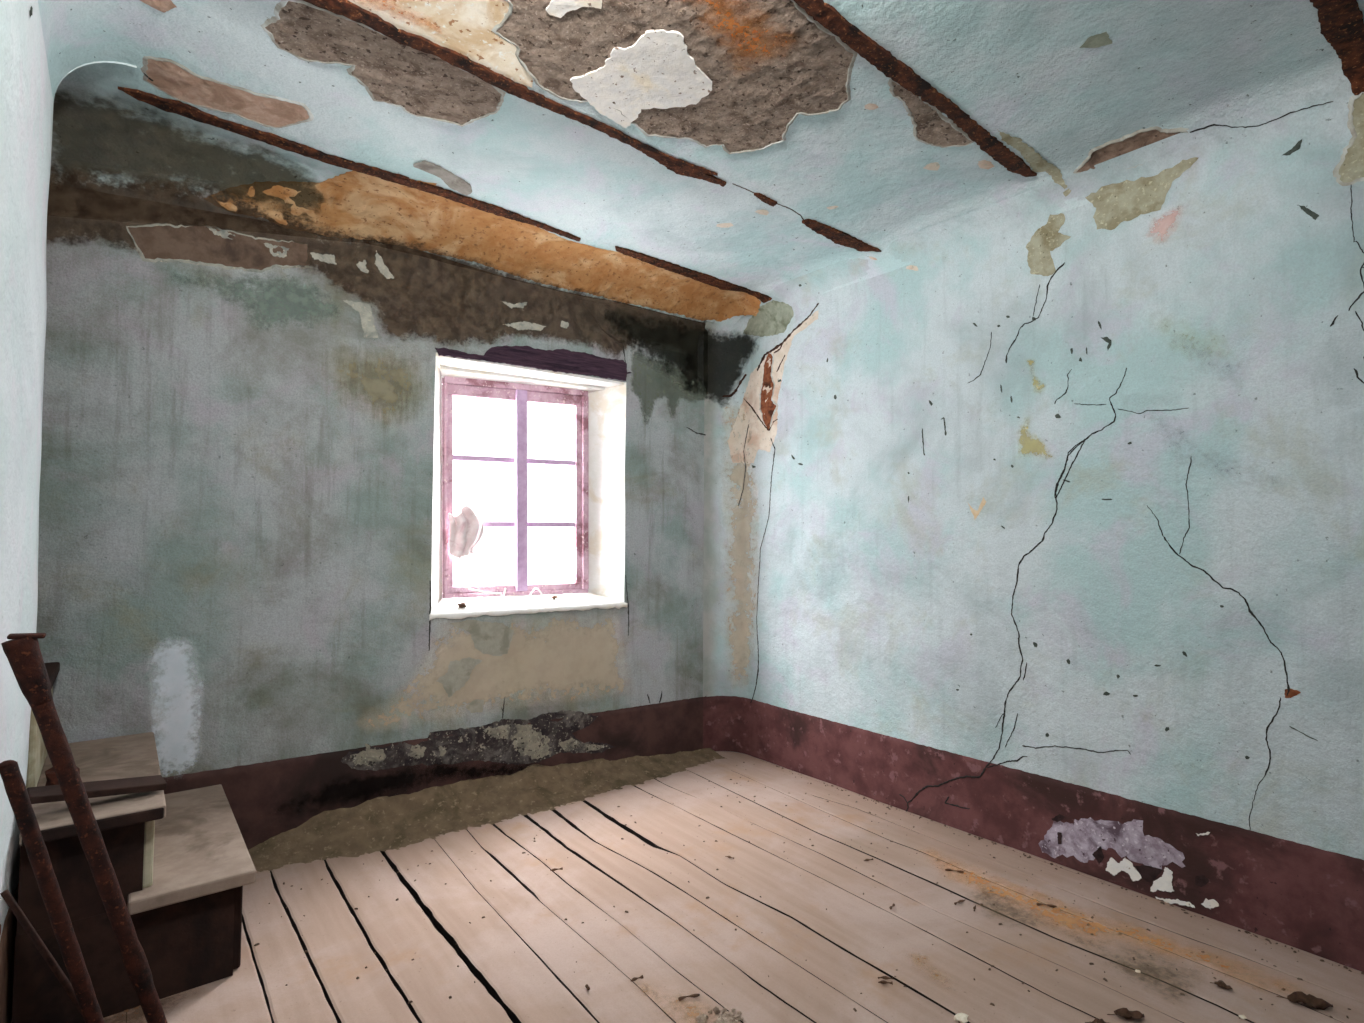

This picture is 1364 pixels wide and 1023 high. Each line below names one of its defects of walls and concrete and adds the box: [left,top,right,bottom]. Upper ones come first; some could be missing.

spalling [140,56,314,128]
spalling [260,0,879,154]
spalling [888,78,974,171]
peeling [997,126,1199,230]
leakage [47,91,755,423]
peeling [1026,213,1071,276]
crack [1330,185,1364,384]
crack [899,368,1188,812]
leakage [379,621,623,720]
crack [1147,456,1290,830]
spalling [341,699,613,771]
spalling [1133,865,1163,883]